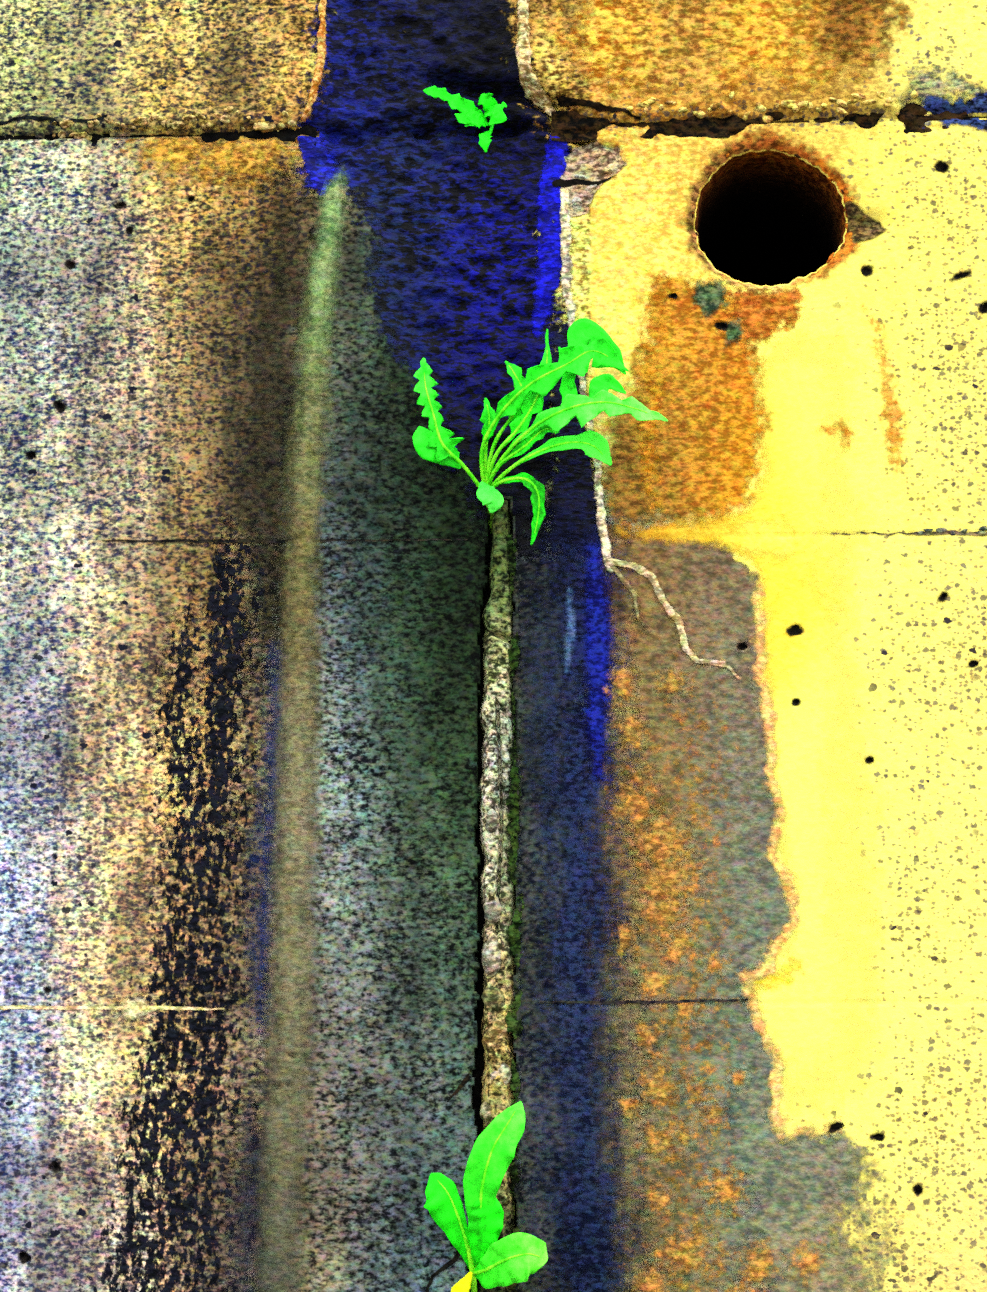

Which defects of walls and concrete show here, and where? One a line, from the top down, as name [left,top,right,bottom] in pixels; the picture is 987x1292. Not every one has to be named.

rust [552,0,913,104]
rust [601,129,858,533]
rust [871,319,904,464]
peeling [606,669,633,700]
crack [605,558,741,680]
spalling [786,625,804,636]
water stain [0,215,305,1292]
crack [103,518,516,1141]
peeling [618,672,777,1292]
crack [426,1251,479,1292]
peeling [792,1240,820,1286]